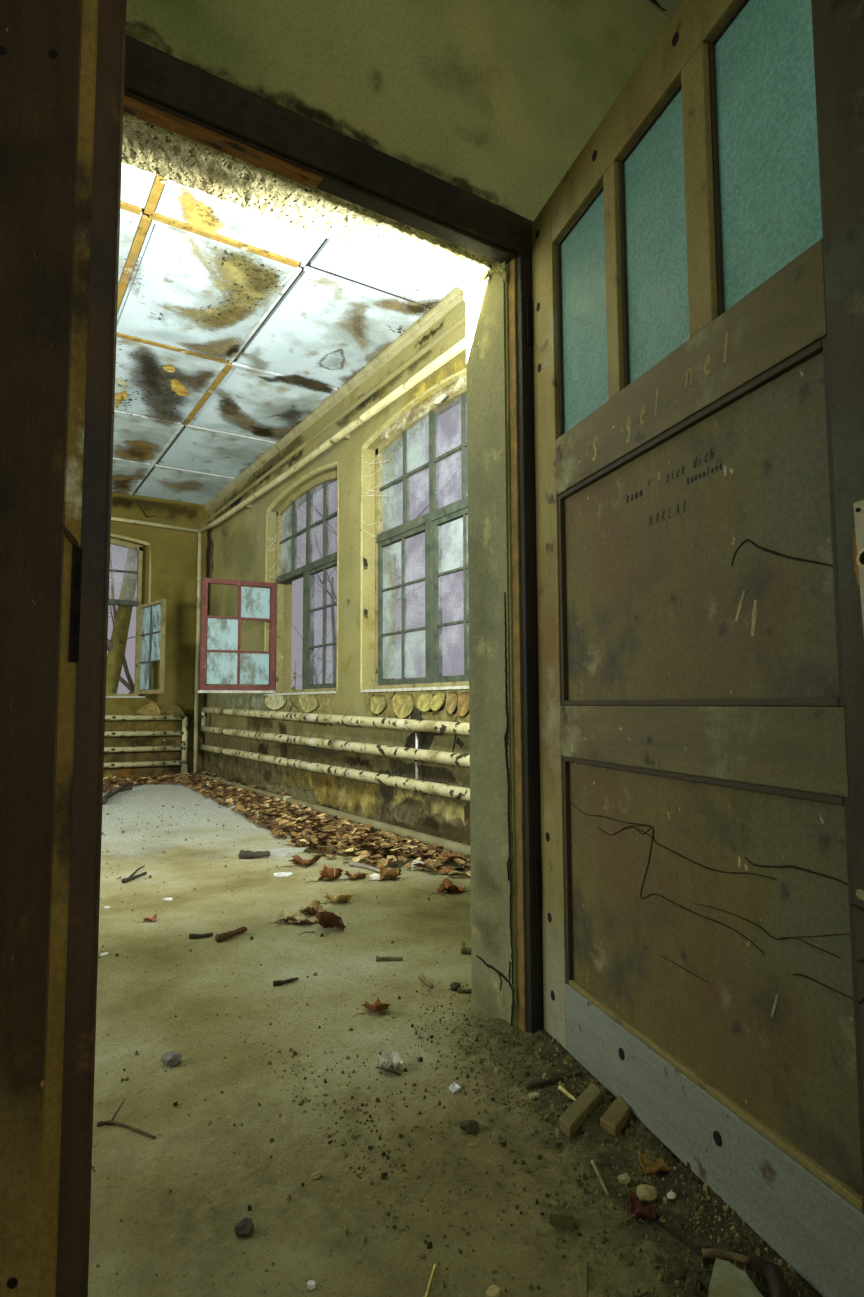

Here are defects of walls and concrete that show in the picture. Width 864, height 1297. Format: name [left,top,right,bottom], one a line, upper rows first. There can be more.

water stain [384,377,464,438]
water stain [112,242,442,784]
crack [731,539,833,567]
water stain [388,790,470,843]
crack [570,801,864,1004]